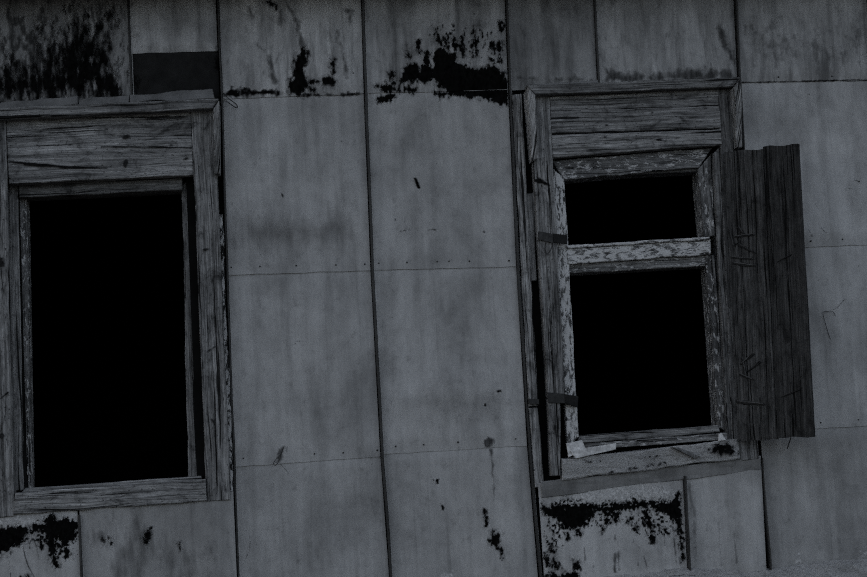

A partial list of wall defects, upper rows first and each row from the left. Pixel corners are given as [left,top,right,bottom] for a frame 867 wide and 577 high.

damp [564,485,675,507]
damp [0,515,43,528]